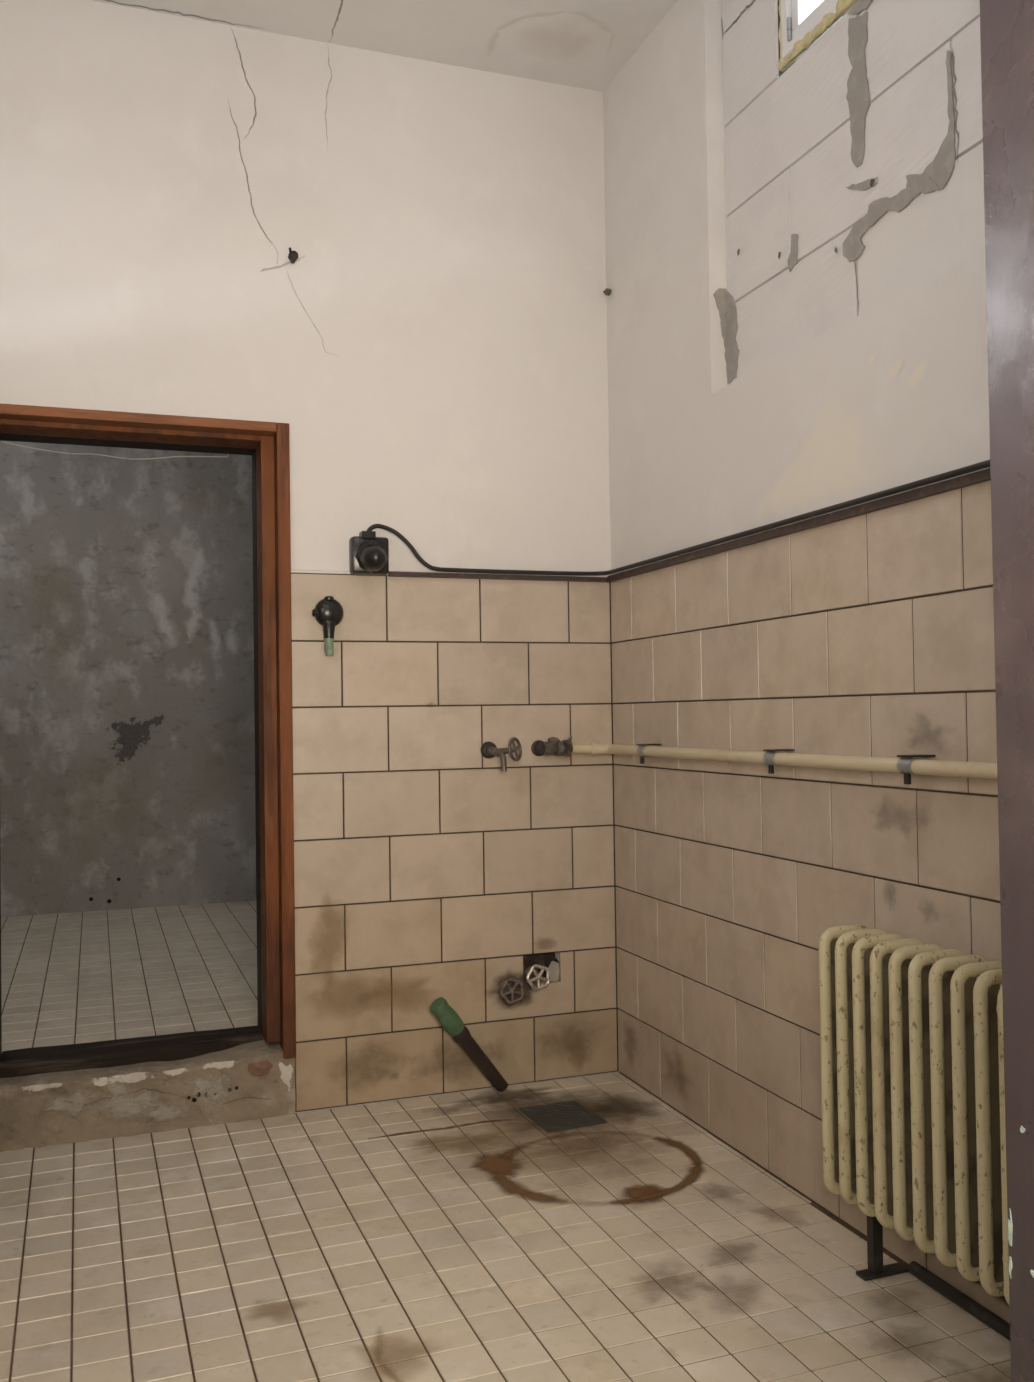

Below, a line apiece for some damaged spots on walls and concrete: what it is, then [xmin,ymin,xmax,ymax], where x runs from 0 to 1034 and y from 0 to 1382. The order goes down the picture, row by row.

water stain [144,465,253,528]
water stain [0,493,256,908]
peeling [22,1061,293,1122]
corrosion [473,1147,557,1202]
corrosion [616,1138,702,1203]